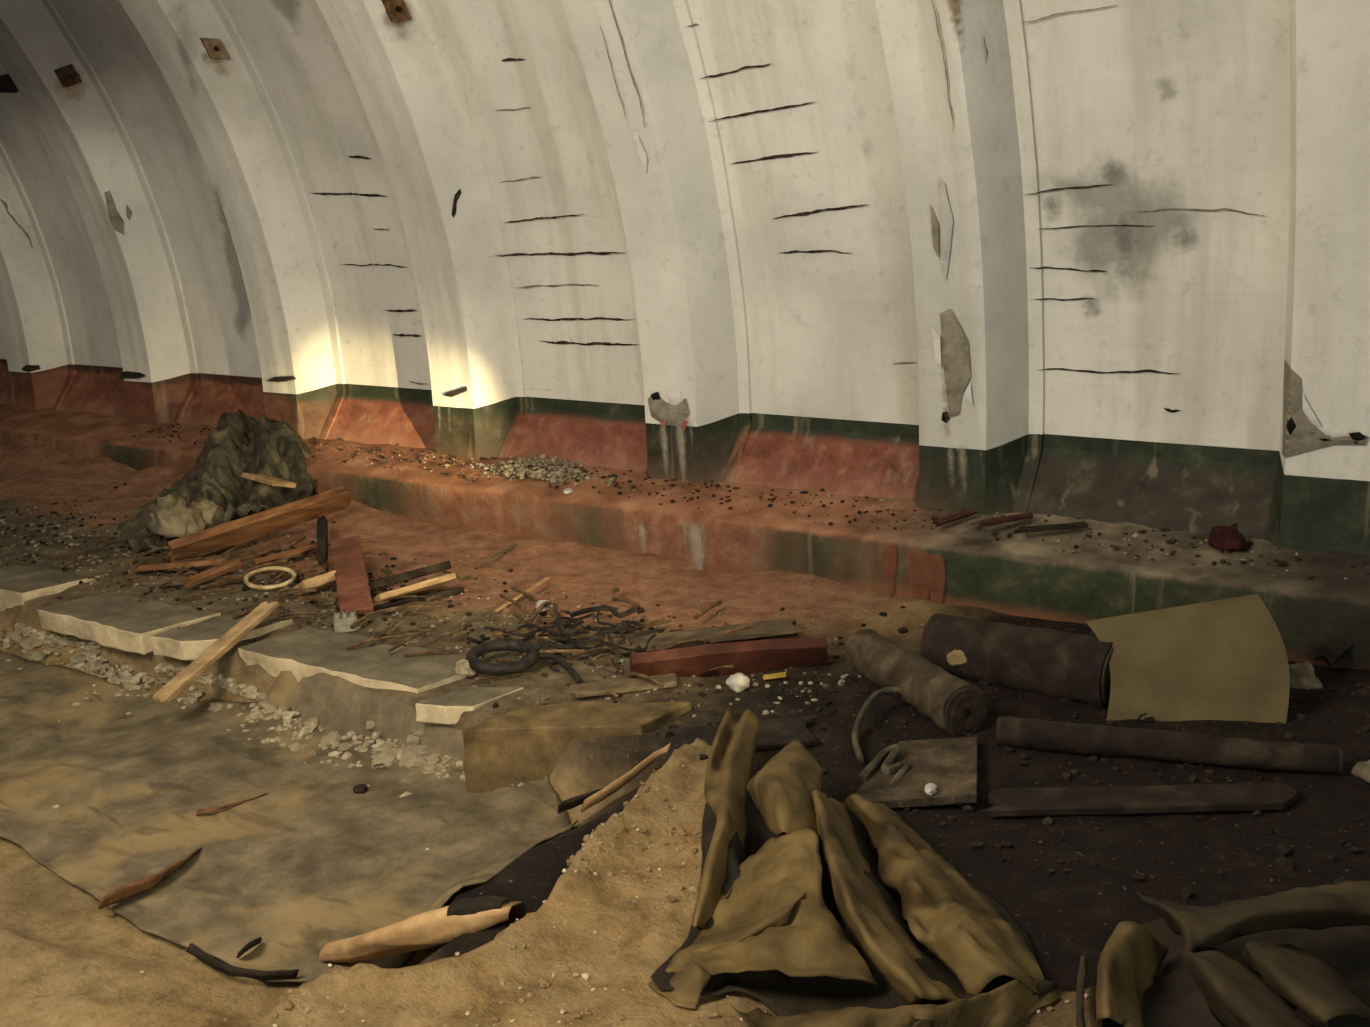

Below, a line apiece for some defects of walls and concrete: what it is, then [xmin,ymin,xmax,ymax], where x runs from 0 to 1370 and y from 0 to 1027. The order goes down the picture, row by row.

rust [948,0,960,25]
crack [700,63,771,79]
crack [709,101,815,122]
crack [731,152,817,164]
peeling [104,191,132,235]
crack [774,205,865,219]
water stain [1077,165,1192,263]
crack [488,214,637,346]
crack [1030,266,1106,301]
peeling [931,309,973,423]
spalling [648,391,690,432]
spalling [1282,360,1368,457]